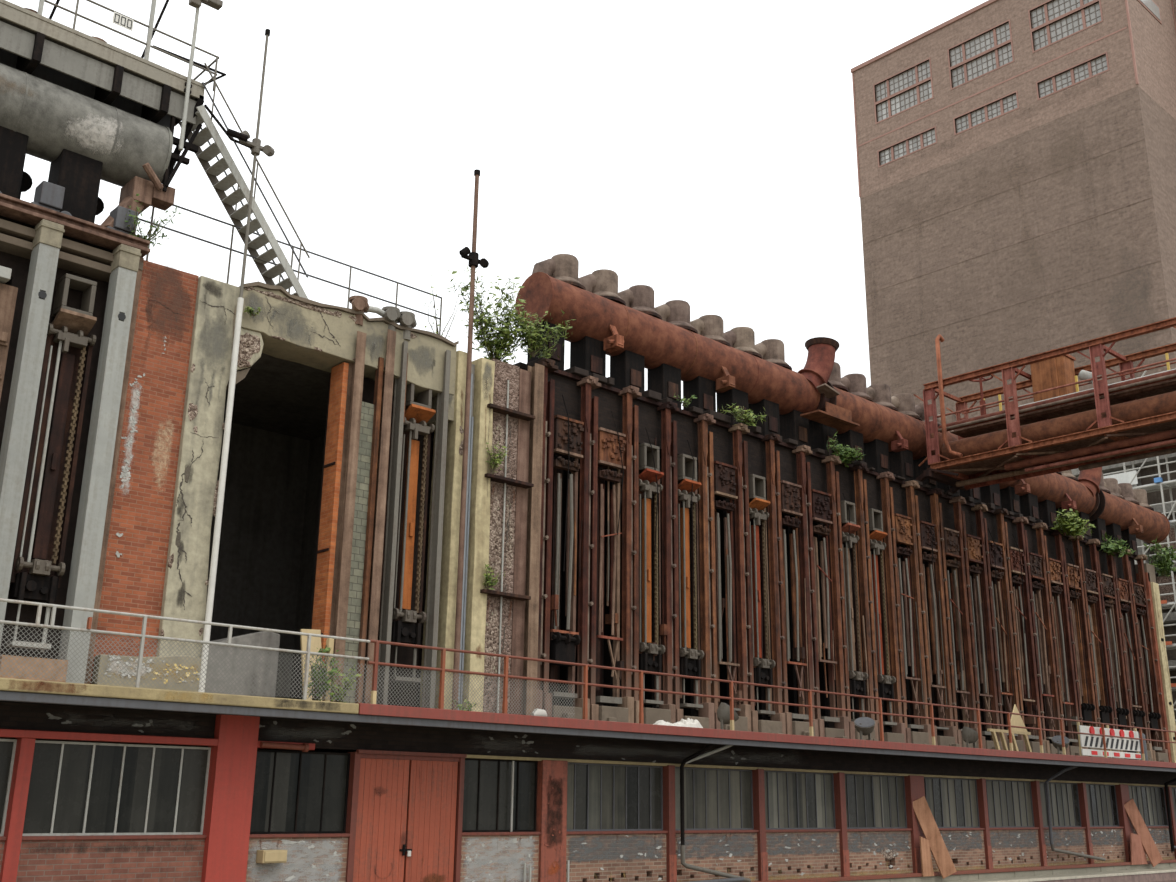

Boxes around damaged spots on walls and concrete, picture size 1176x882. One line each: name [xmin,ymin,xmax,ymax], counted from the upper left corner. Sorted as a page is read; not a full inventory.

peeling [120,373,145,488]
crack [176,432,217,610]